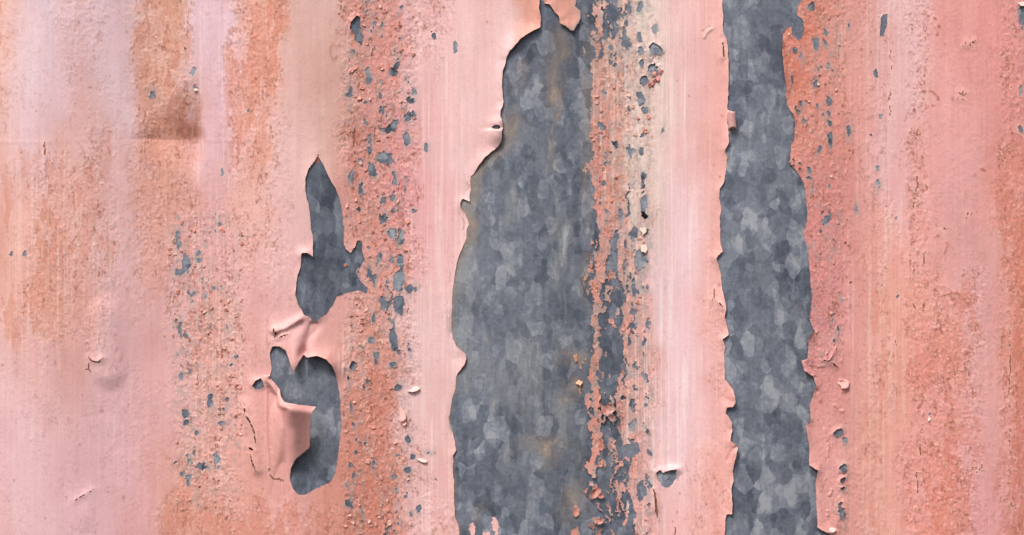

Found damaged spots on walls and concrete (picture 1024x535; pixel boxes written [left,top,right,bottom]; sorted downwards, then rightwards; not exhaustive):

spalling [172,278,243,355]
spalling [174,345,429,535]
spalling [295,0,420,399]
peeling [449,0,682,535]
peeling [717,0,849,535]